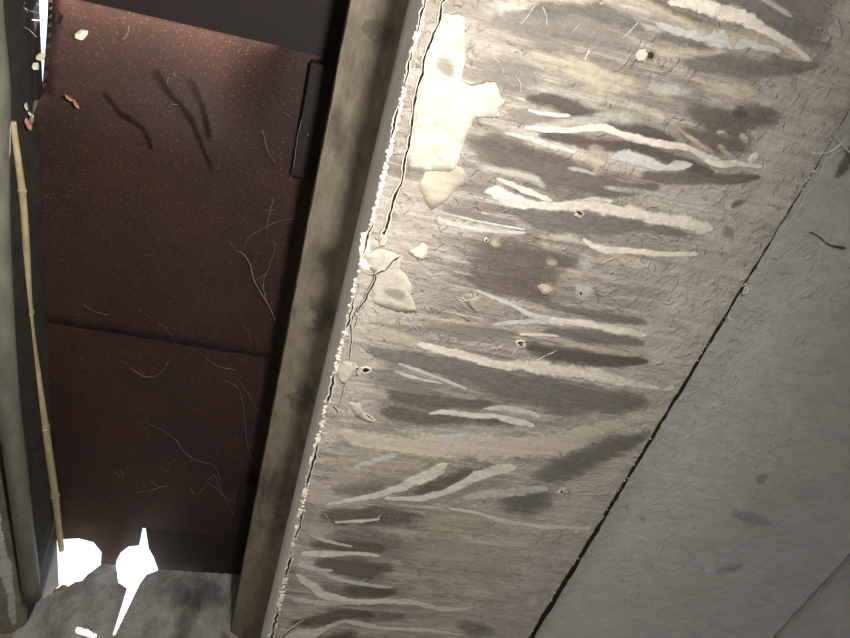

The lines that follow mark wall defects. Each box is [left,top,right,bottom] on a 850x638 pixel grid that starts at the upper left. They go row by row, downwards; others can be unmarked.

crack [378,0,447,241]
flaking render [407,12,504,210]
spalling [268,0,428,638]
crack [348,309,360,361]
water stain [284,0,826,638]